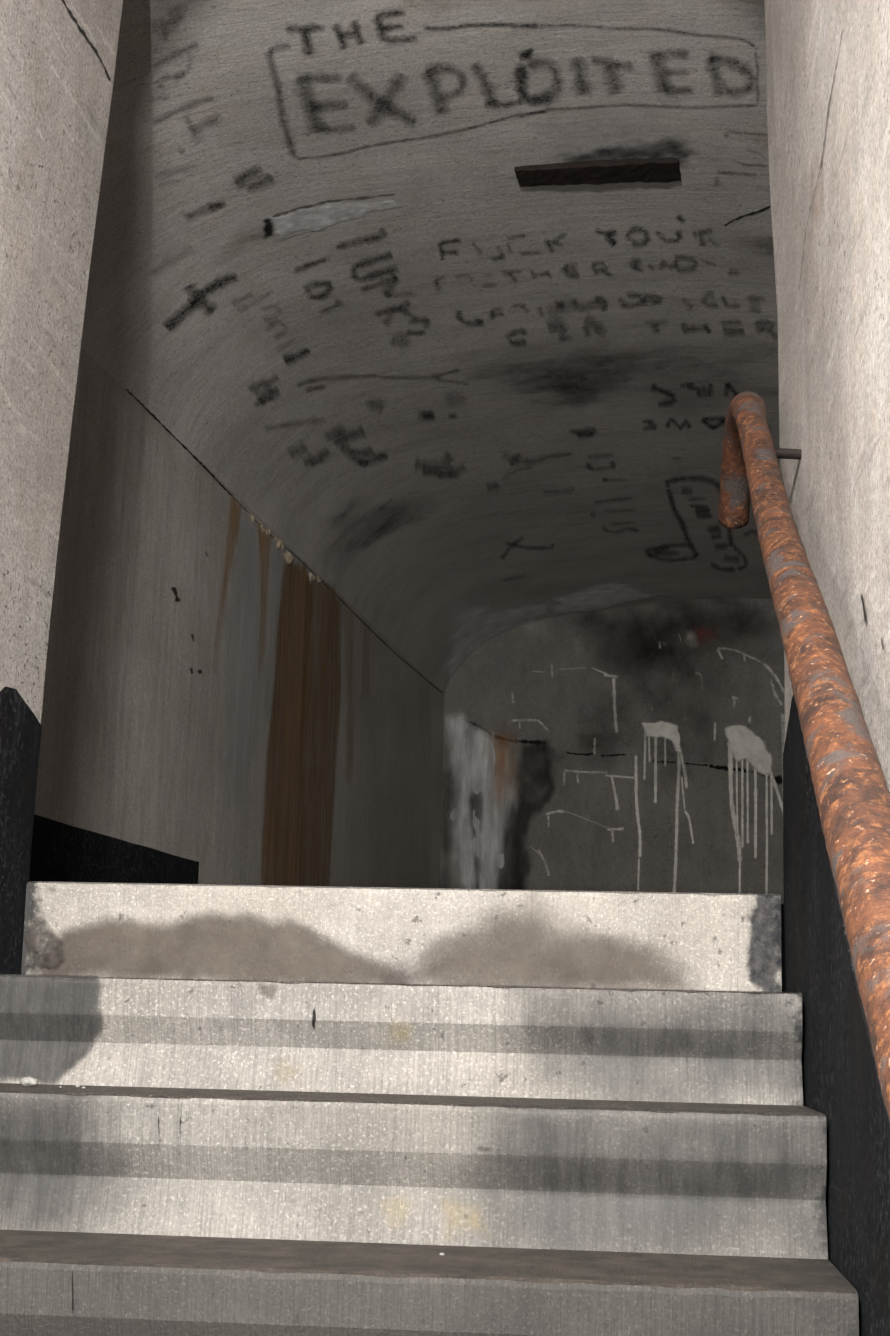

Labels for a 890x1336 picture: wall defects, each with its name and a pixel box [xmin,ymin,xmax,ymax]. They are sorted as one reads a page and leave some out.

crack [62,0,111,81]
rust [262,563,340,886]